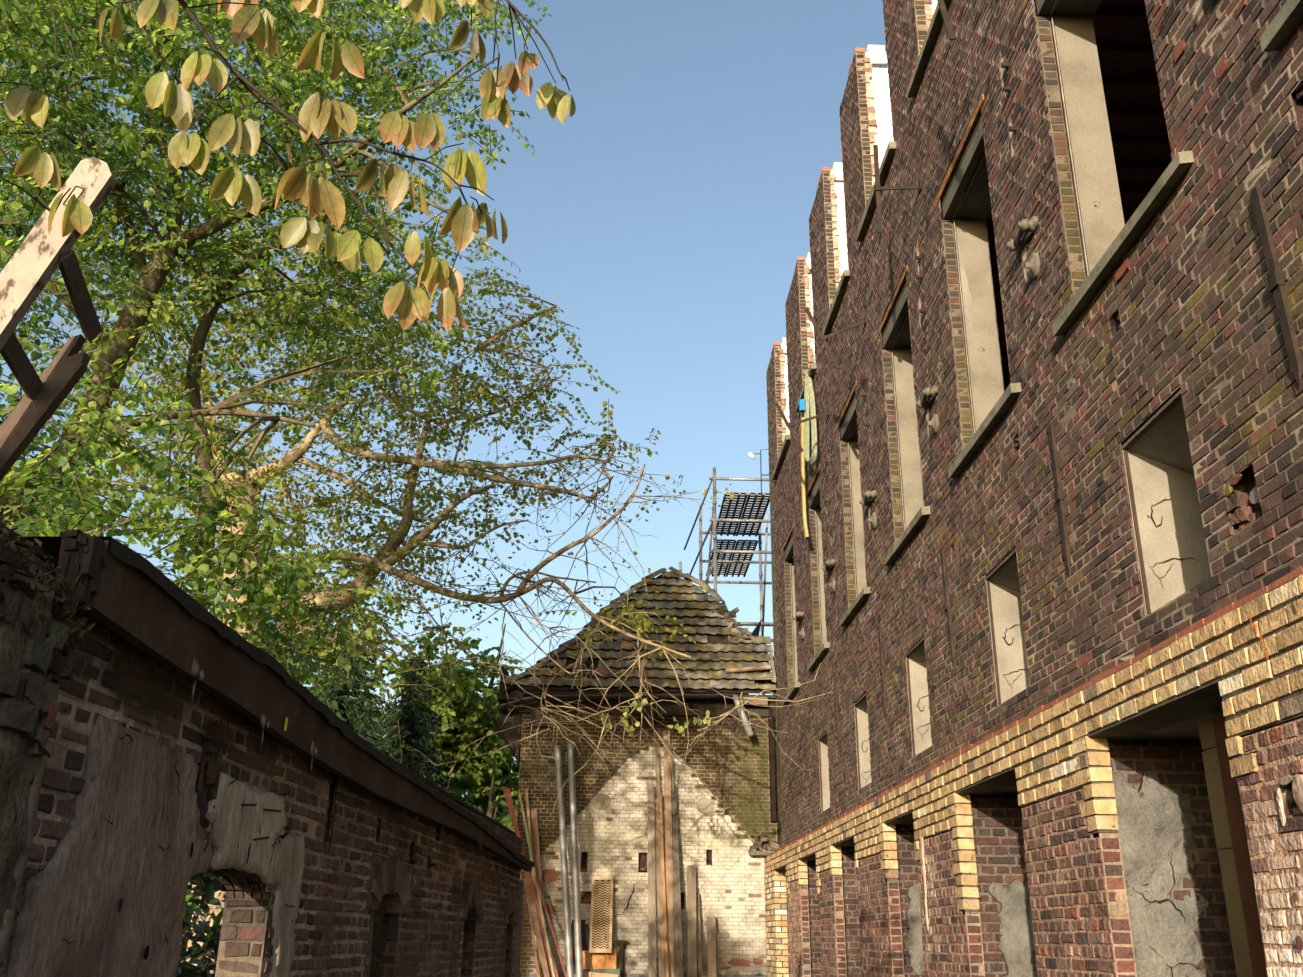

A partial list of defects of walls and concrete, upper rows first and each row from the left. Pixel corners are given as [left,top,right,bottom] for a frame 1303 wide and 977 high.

spalling [1285,71,1303,132]
crack [1147,498,1172,527]
spalling [1224,464,1266,540]
crack [1151,557,1198,587]
flaking render [0,545,80,757]
flaking render [190,721,224,858]
spalling [1276,774,1303,826]